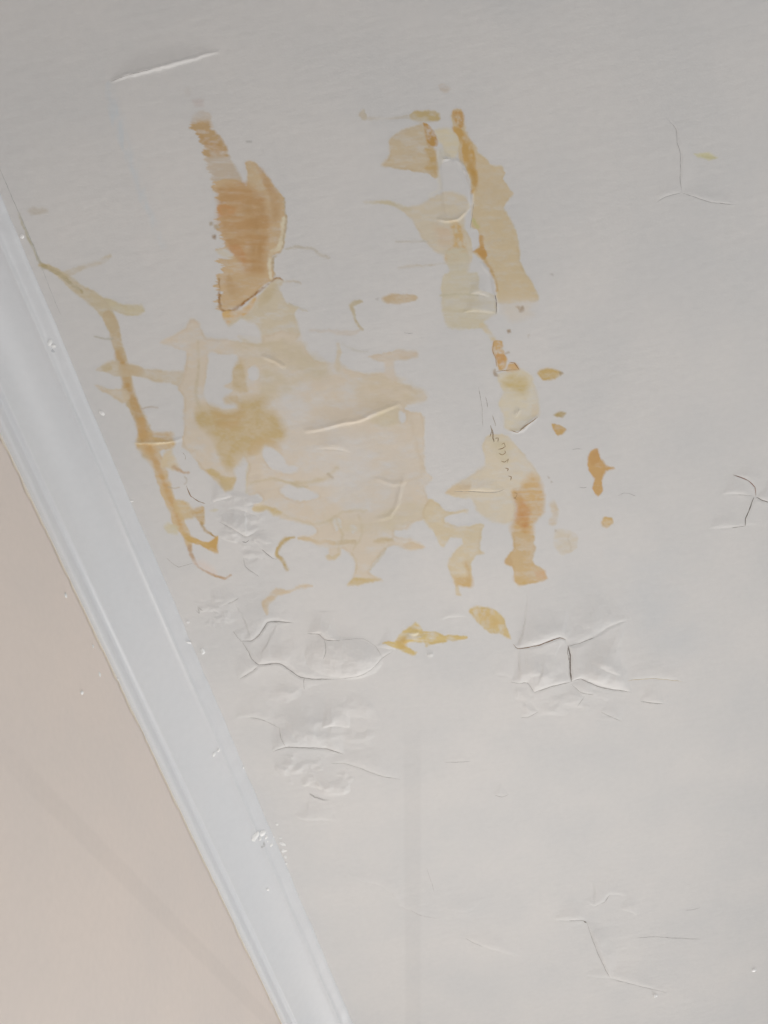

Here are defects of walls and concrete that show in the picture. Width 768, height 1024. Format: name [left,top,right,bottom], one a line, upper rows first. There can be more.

damp [358,108,541,340]
damp [16,83,512,641]
damp [536,366,565,382]
damp [550,410,567,437]
damp [586,447,616,498]